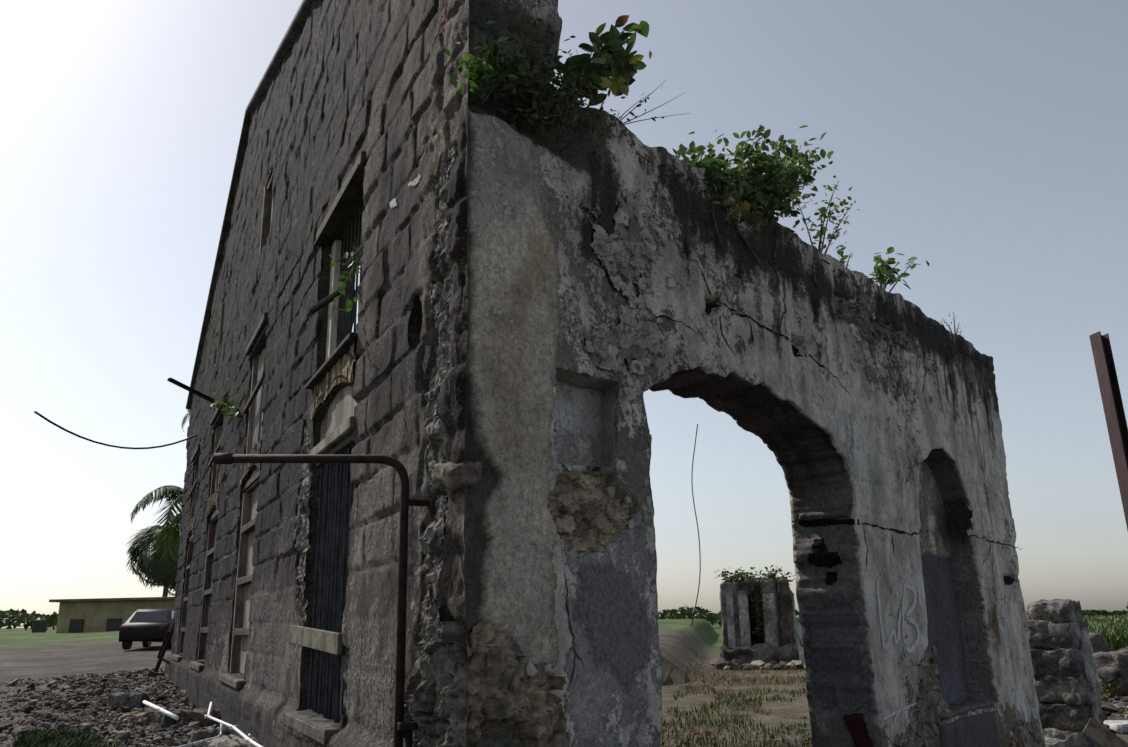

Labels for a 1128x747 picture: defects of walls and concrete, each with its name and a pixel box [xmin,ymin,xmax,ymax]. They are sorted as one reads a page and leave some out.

damp [569,154,624,284]
peeling [579,189,676,375]
damp [658,163,861,322]
spalling [419,143,458,607]
damp [874,294,993,473]
spalling [294,423,311,621]
spalling [545,463,635,559]
crack [799,518,929,572]
spalling [466,623,571,747]
spalling [905,645,952,747]